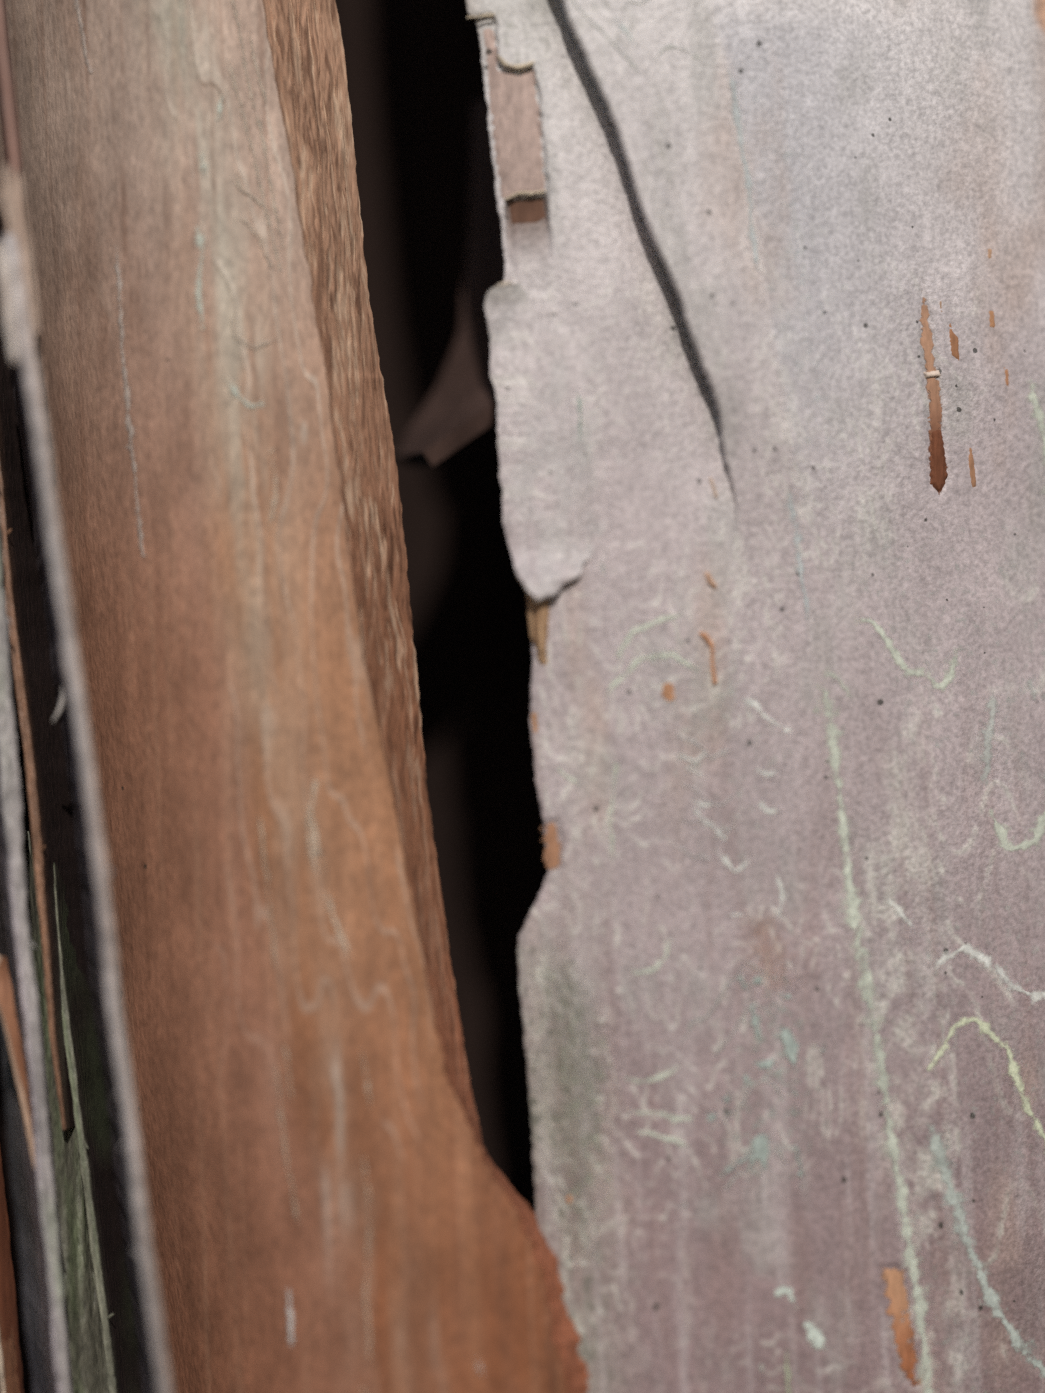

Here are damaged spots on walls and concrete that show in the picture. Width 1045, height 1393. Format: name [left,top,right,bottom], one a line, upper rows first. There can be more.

peeling [484,281,622,602]